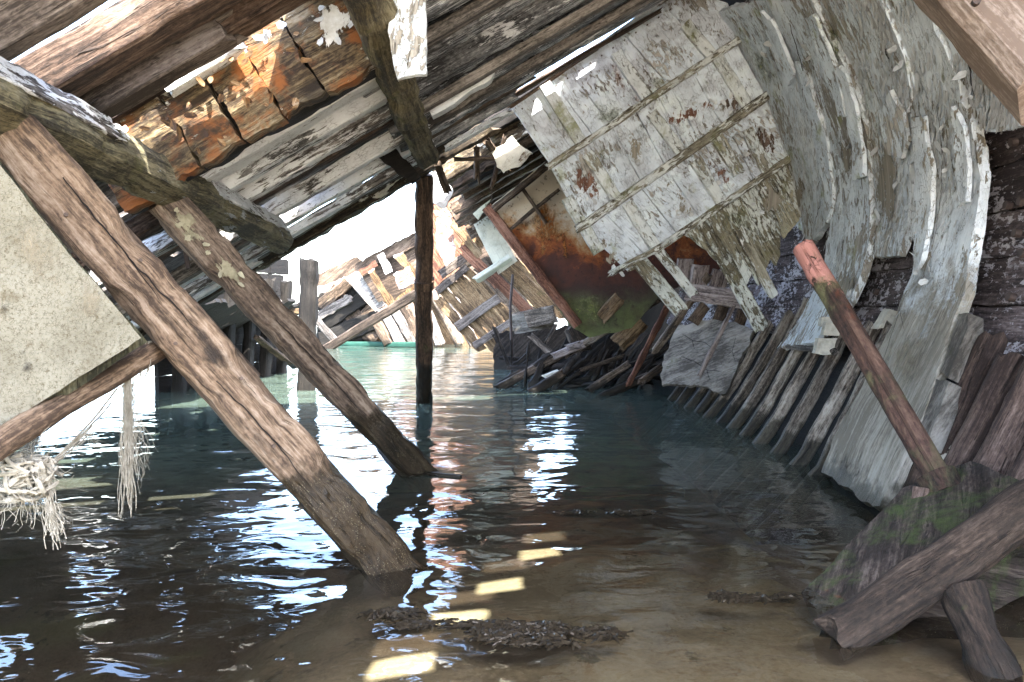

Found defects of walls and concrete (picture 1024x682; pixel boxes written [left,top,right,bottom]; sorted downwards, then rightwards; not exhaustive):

peeling [313,4,353,48]
peeling [658,92,746,128]
peeling [625,136,642,166]
peeling [726,0,1018,297]
peeling [572,169,601,205]
peeling [667,183,694,216]
peeling [170,207,245,287]
peeling [601,239,625,277]